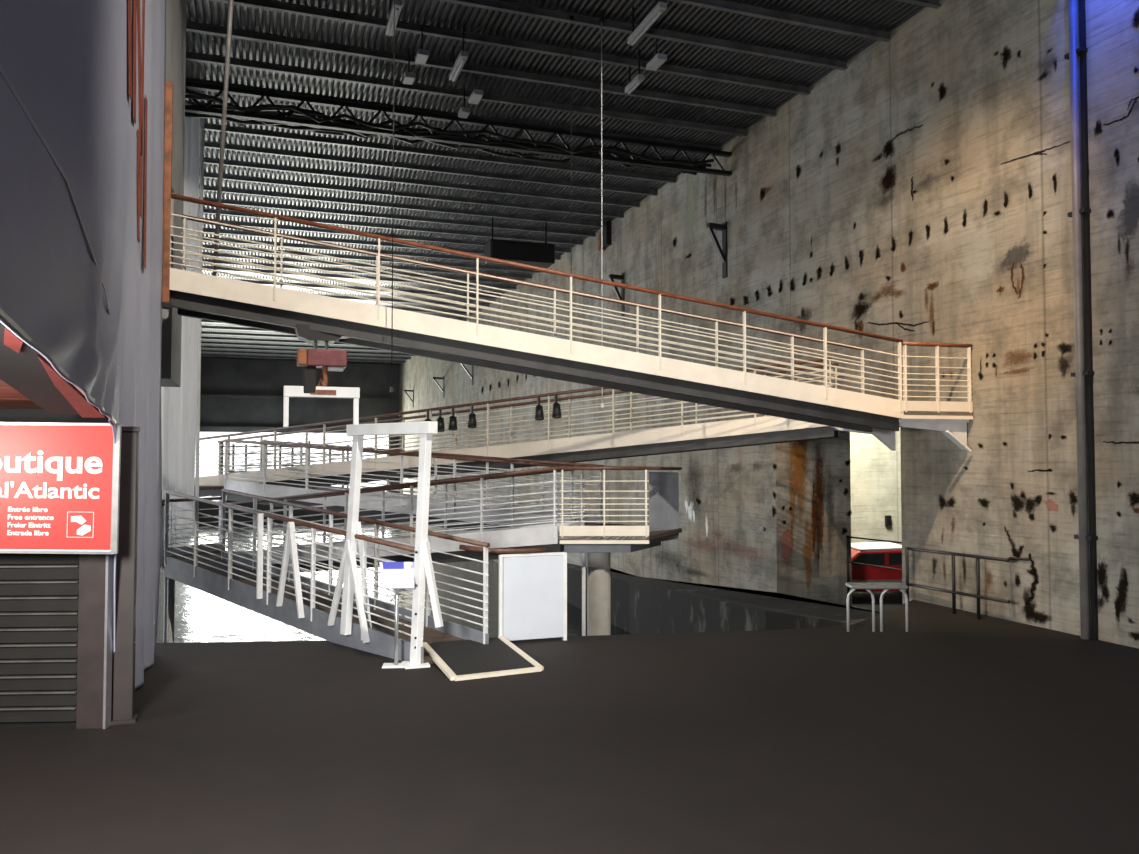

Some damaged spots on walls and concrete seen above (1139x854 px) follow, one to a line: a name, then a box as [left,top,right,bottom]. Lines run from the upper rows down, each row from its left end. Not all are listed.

crack [1000,96,1139,165]
rust [925,282,938,334]
rust [790,441,824,587]